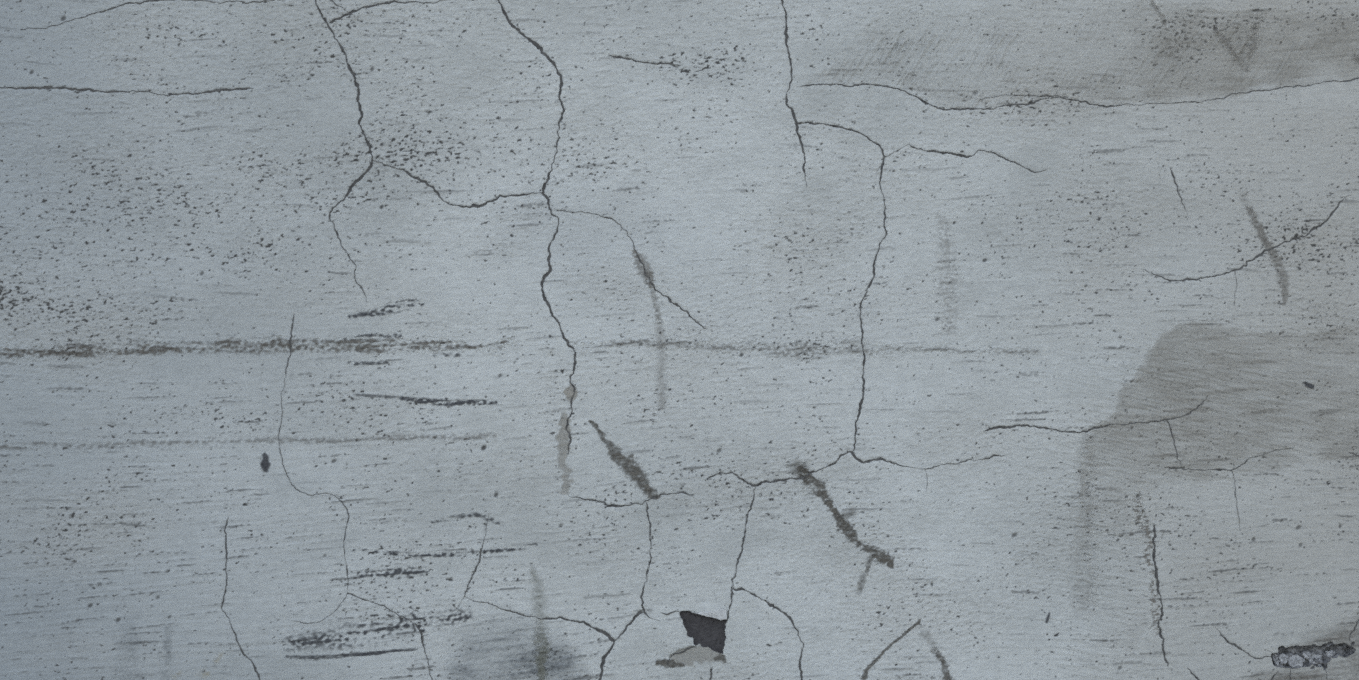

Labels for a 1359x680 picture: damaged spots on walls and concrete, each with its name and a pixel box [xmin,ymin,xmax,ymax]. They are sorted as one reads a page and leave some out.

crack [0,86,253,96]
crack [20,0,274,30]
crack [315,0,705,454]
crack [457,0,1359,680]
crack [278,315,433,680]
crack [221,516,260,680]
spalling [656,608,727,668]
spalling [1271,642,1356,670]